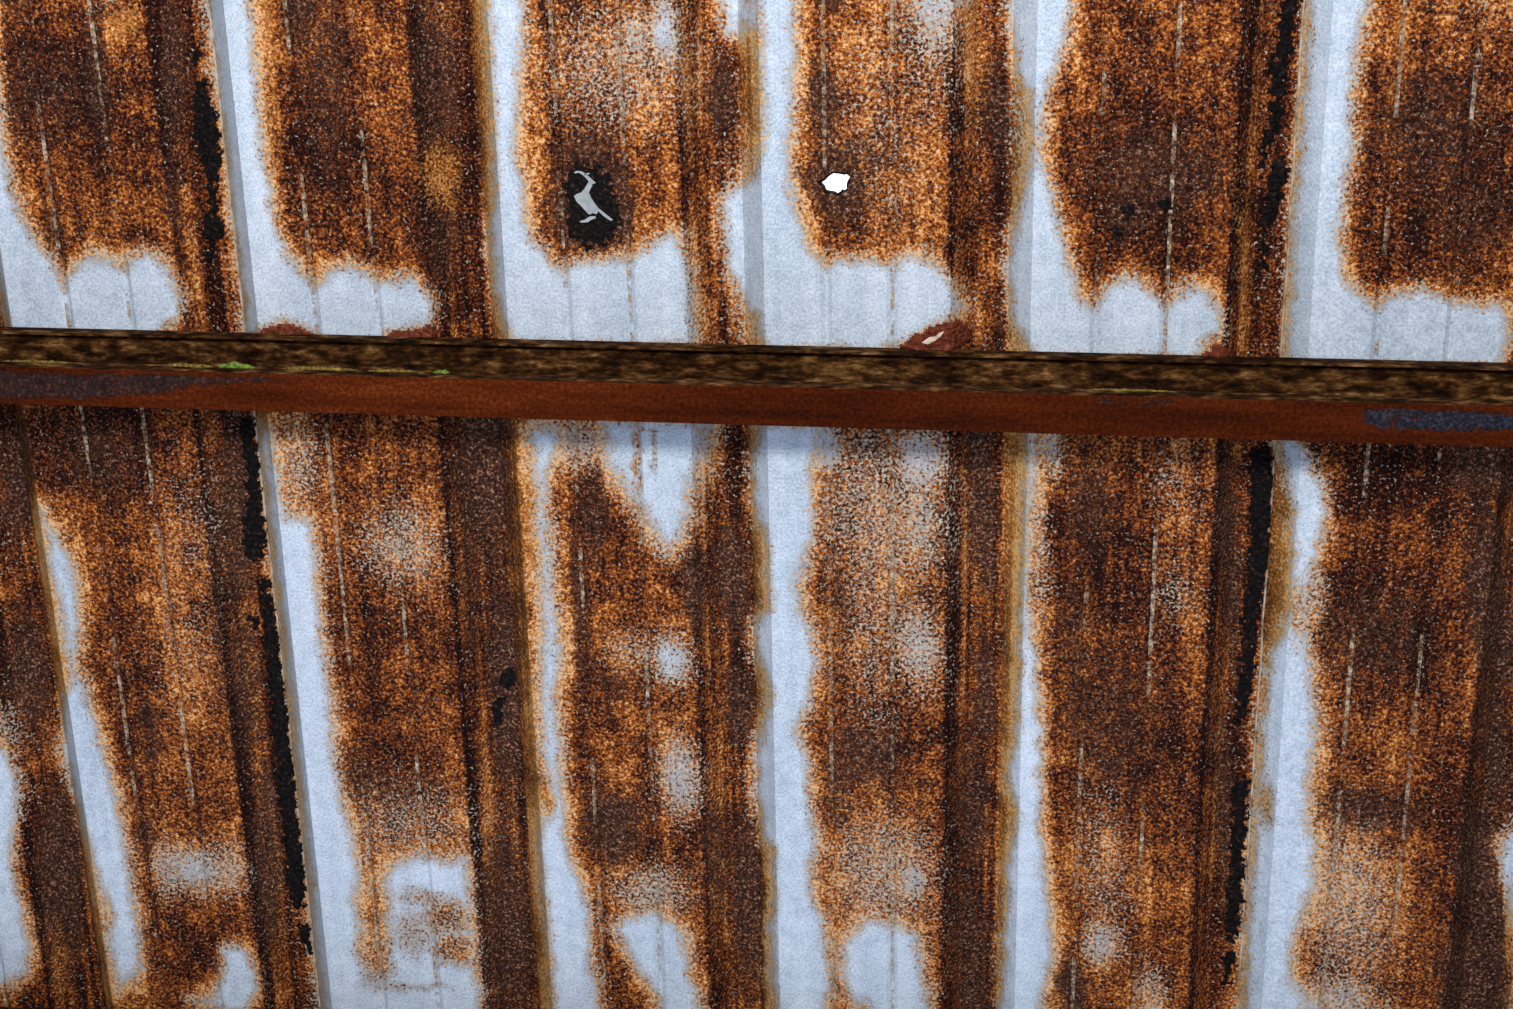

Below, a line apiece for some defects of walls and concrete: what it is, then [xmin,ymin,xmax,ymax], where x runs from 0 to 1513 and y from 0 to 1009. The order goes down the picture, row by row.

rust [0,0,1317,358]
rust [1330,0,1513,363]
rust [0,404,1513,1009]